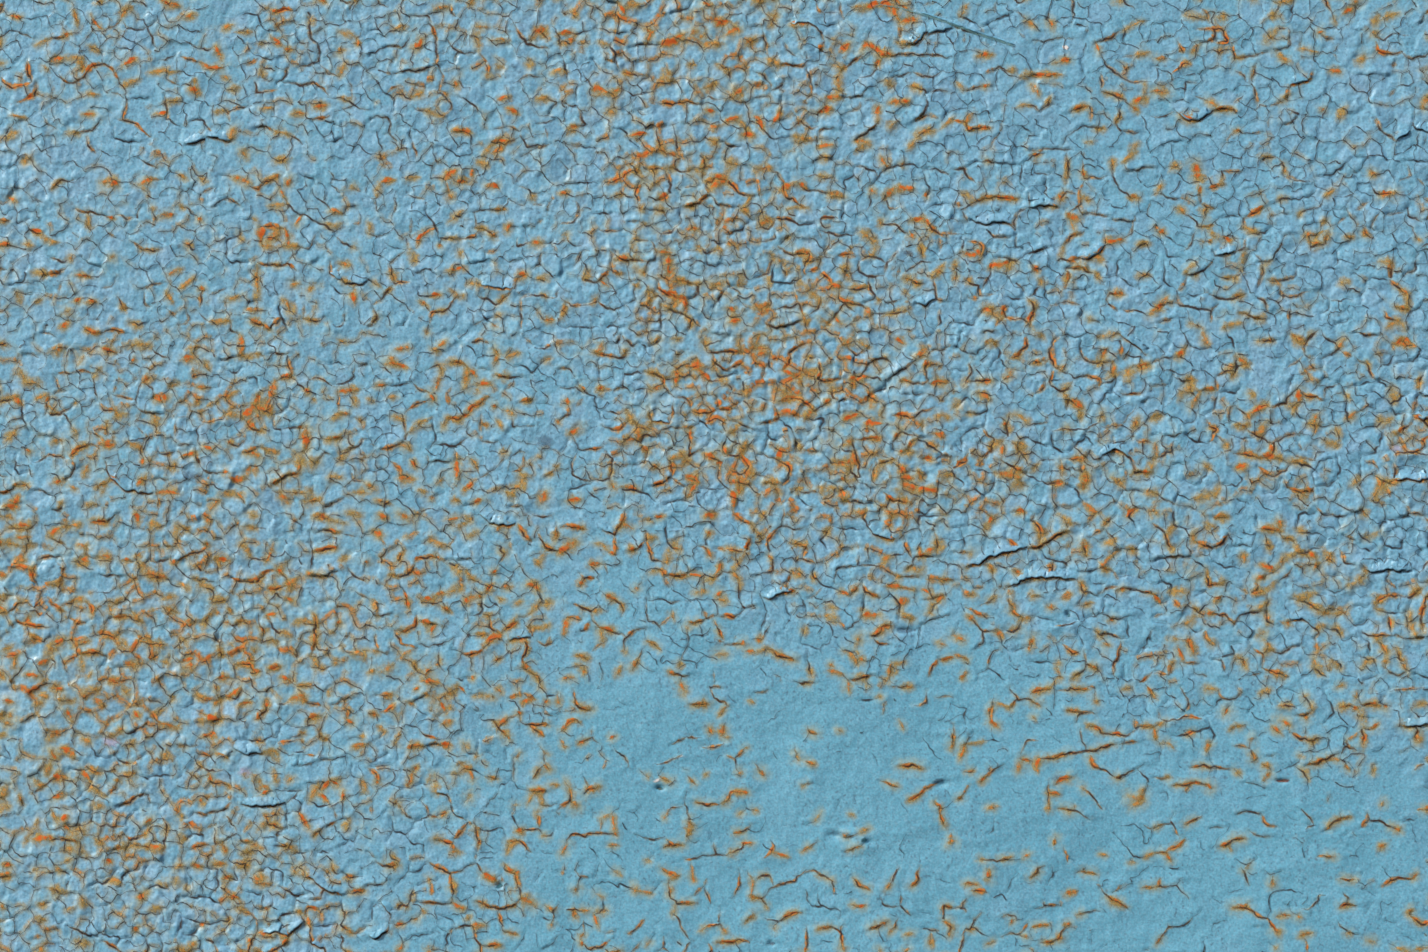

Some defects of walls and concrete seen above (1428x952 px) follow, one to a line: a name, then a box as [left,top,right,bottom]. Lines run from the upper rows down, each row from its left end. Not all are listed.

crack [0,206,104,332]
corrosion [1045,161,1164,312]
corrosion [475,0,1083,705]
corrosion [1157,161,1428,515]
corrosion [1009,412,1175,570]
corrosion [0,318,624,952]
corrosion [1125,570,1236,694]
crack [887,695,1031,822]
crack [735,869,861,949]
crack [874,817,1199,952]
crack [1233,861,1320,931]
crack [1294,810,1428,933]